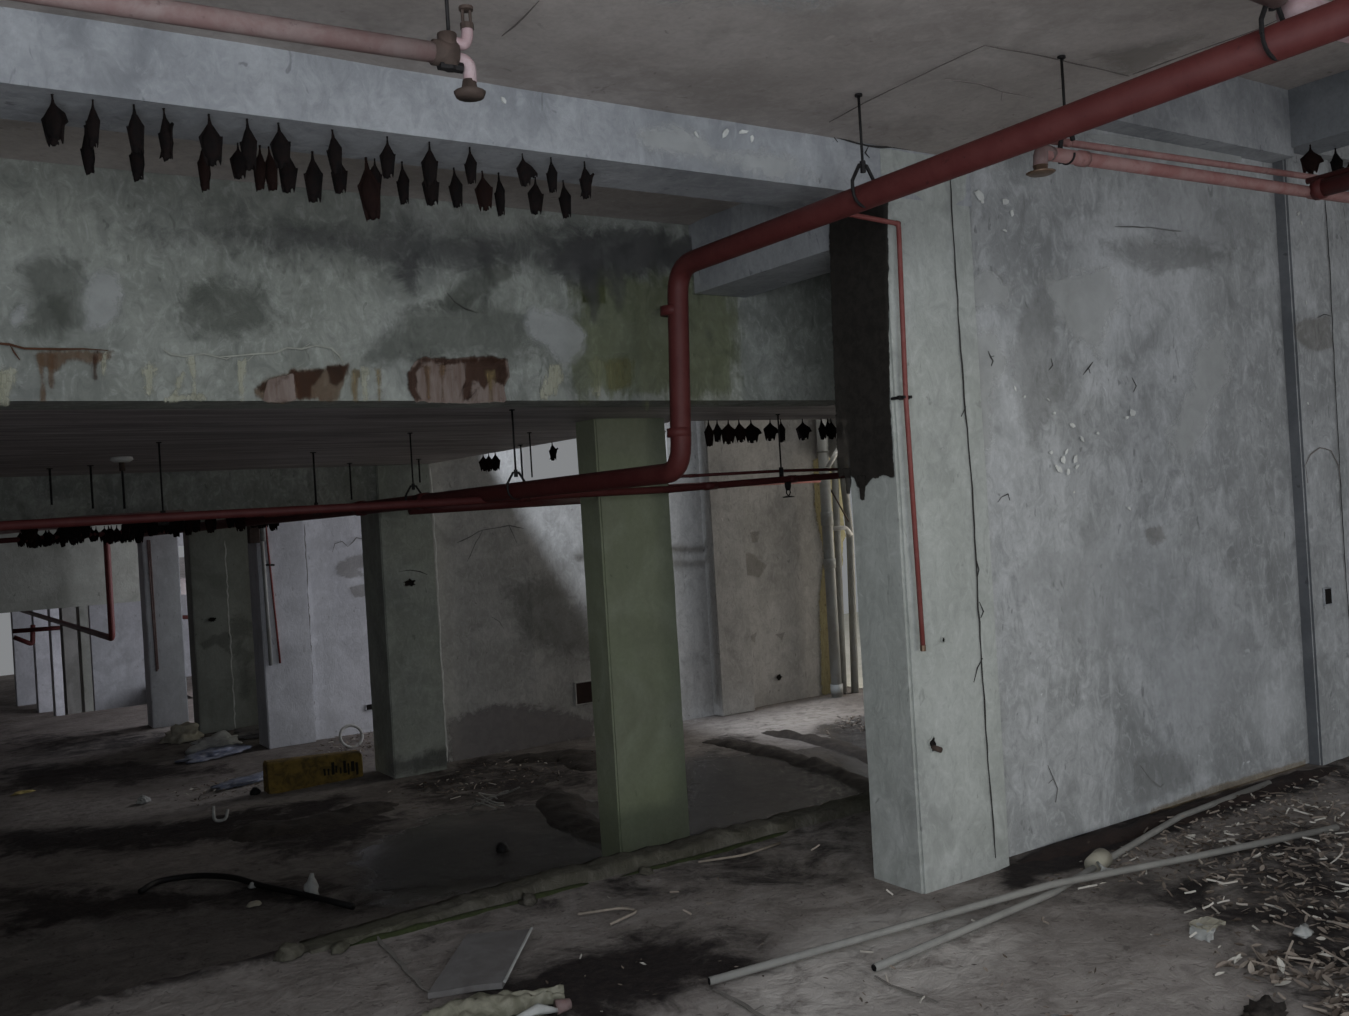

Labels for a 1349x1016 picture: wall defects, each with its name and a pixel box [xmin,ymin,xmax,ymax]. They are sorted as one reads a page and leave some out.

spalling [407,356,510,404]